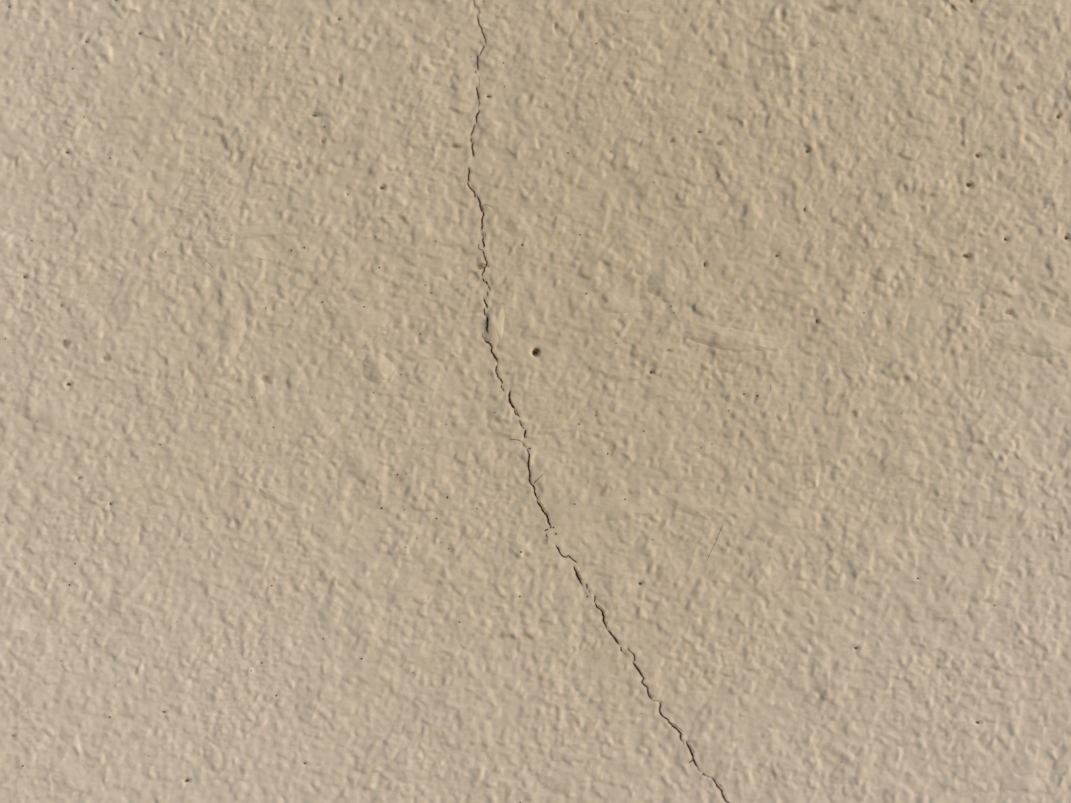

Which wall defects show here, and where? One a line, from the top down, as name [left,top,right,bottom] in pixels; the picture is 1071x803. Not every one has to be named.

crack [467,0,729,803]